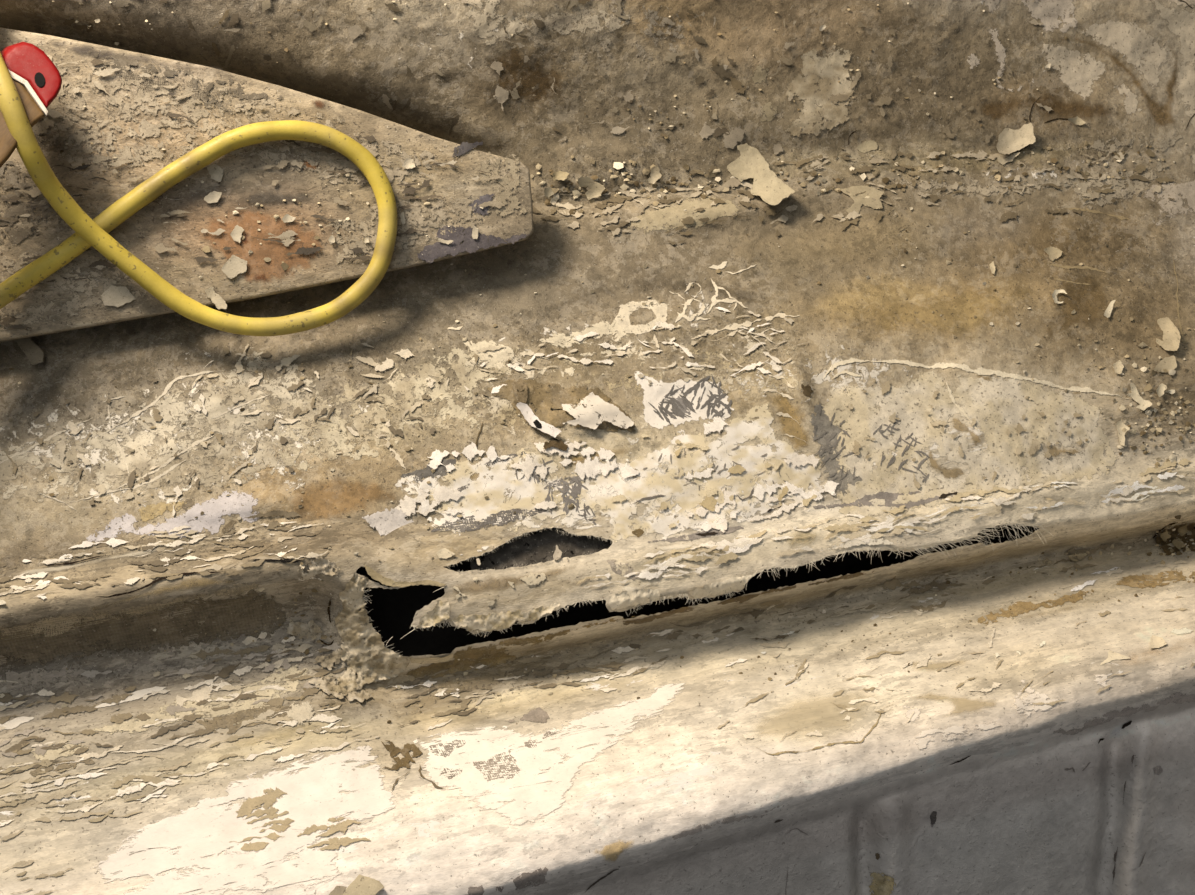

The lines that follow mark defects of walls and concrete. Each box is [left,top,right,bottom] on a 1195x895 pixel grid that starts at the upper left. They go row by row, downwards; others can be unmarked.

water stain [1030,97,1108,117]
water stain [1111,56,1175,125]
peeling [0,299,1195,605]
crack [319,518,1053,696]
peeling [0,570,1000,895]
peeling [969,680,1059,720]
peeling [1094,650,1130,687]
peeling [1053,692,1195,735]